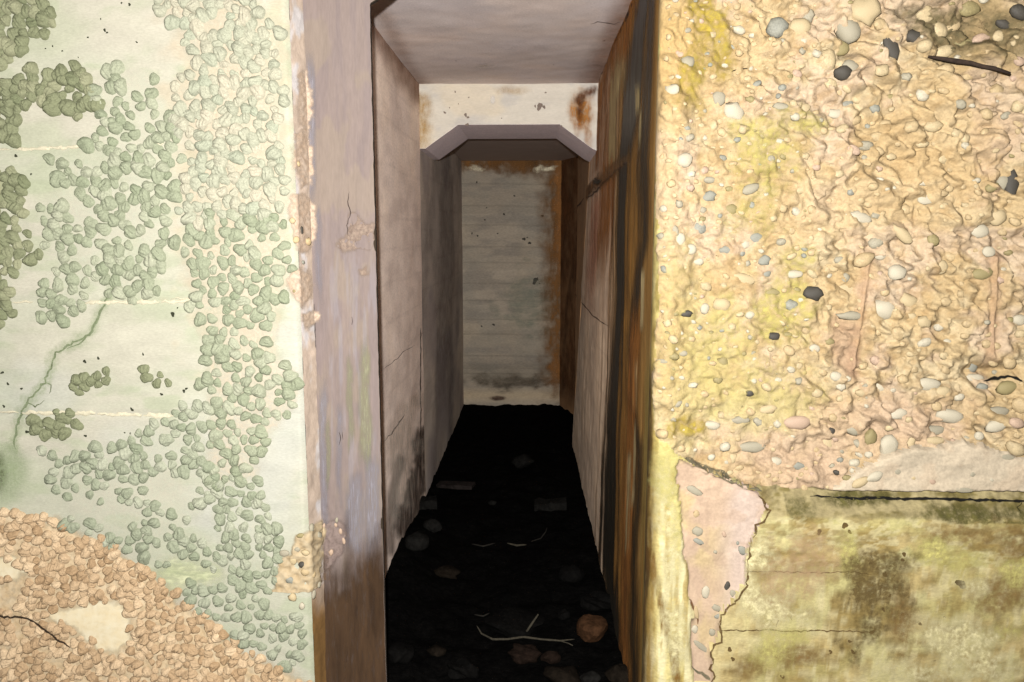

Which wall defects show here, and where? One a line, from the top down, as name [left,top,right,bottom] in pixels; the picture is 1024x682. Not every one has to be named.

rust [570,0,636,267]
crack [13,288,113,447]
spalling [651,0,1024,682]
crack [810,495,1024,513]
crack [0,615,69,647]
leakage [739,540,824,628]
leakage [775,645,817,668]
leakage [845,551,913,653]
leakage [890,617,1015,682]